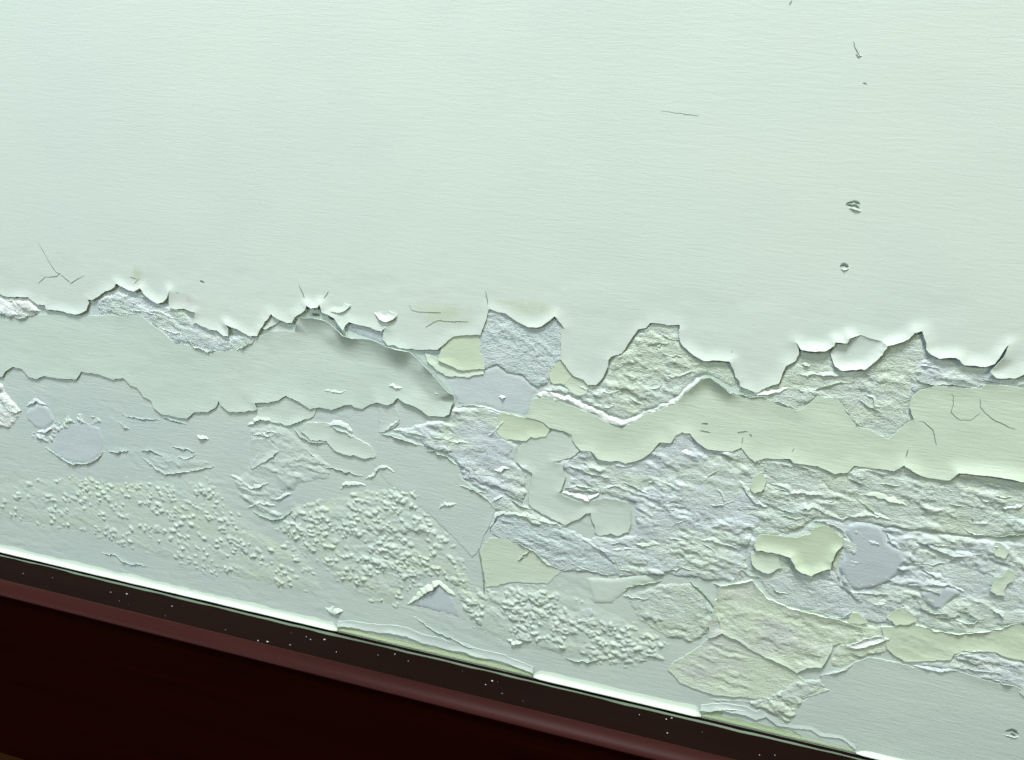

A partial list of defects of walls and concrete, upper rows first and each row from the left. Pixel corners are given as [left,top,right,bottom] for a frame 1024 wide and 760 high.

crack [38,243,83,283]
crack [919,395,1015,444]
peeling [0,246,1024,760]